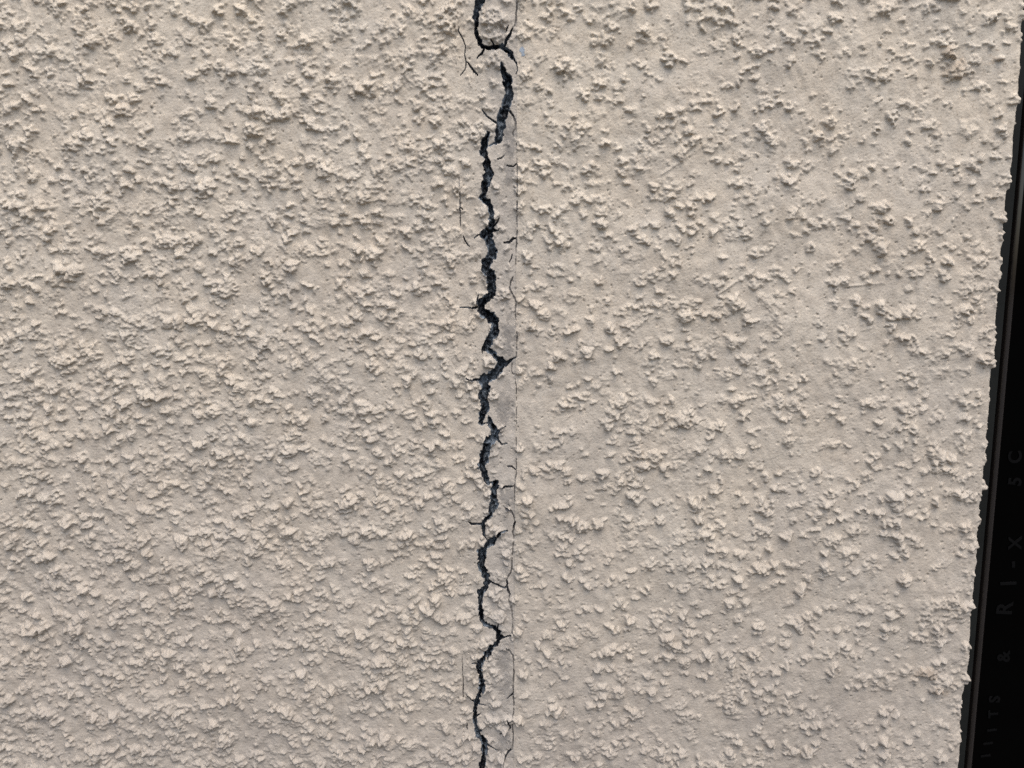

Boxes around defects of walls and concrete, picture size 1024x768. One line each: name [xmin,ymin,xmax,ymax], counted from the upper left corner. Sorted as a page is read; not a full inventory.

crack [458,0,518,768]